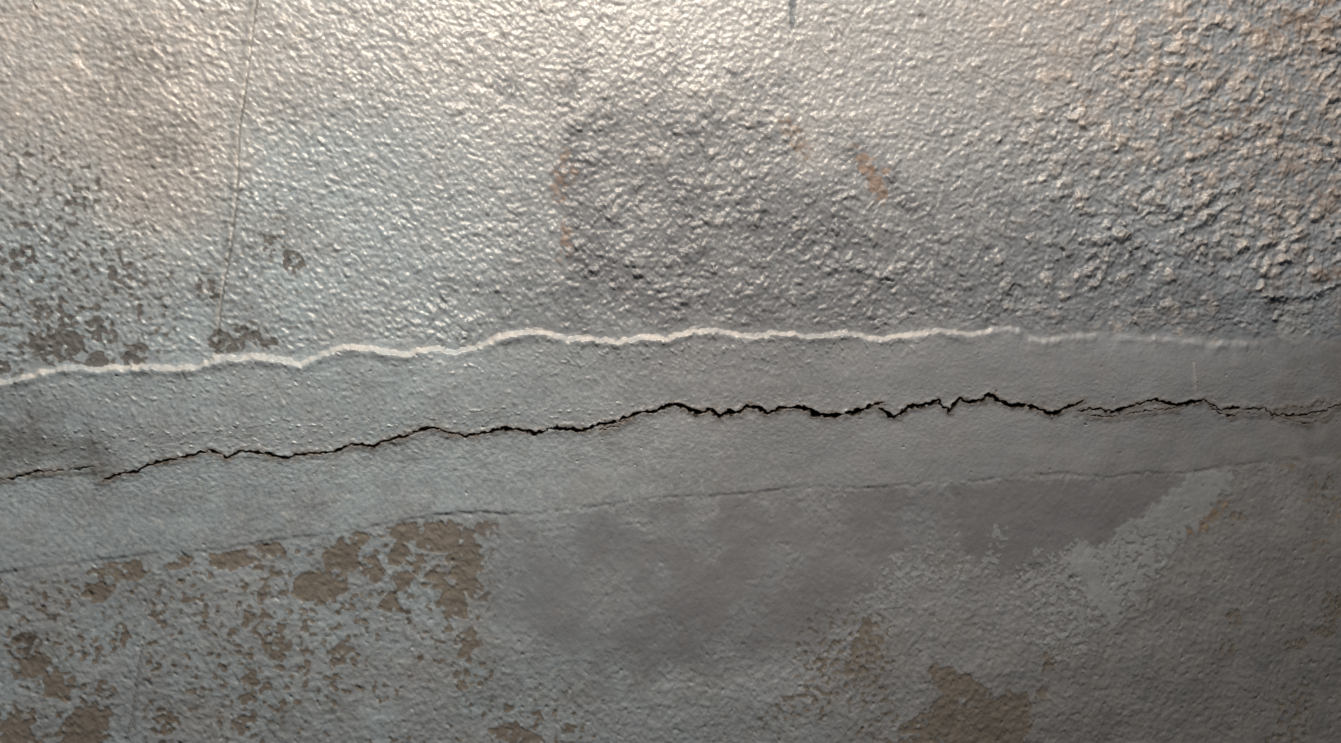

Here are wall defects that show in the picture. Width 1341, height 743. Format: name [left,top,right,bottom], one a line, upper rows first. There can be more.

damp [663,119,701,154]
peeling [0,144,168,367]
peeling [195,269,220,300]
peeling [262,234,306,274]
damp [563,128,715,335]
damp [739,181,840,255]
peeling [0,360,20,374]
peeling [208,321,278,354]
crack [102,393,1341,482]
crack [9,469,70,481]
peeling [0,520,595,743]
peeling [759,468,1233,743]